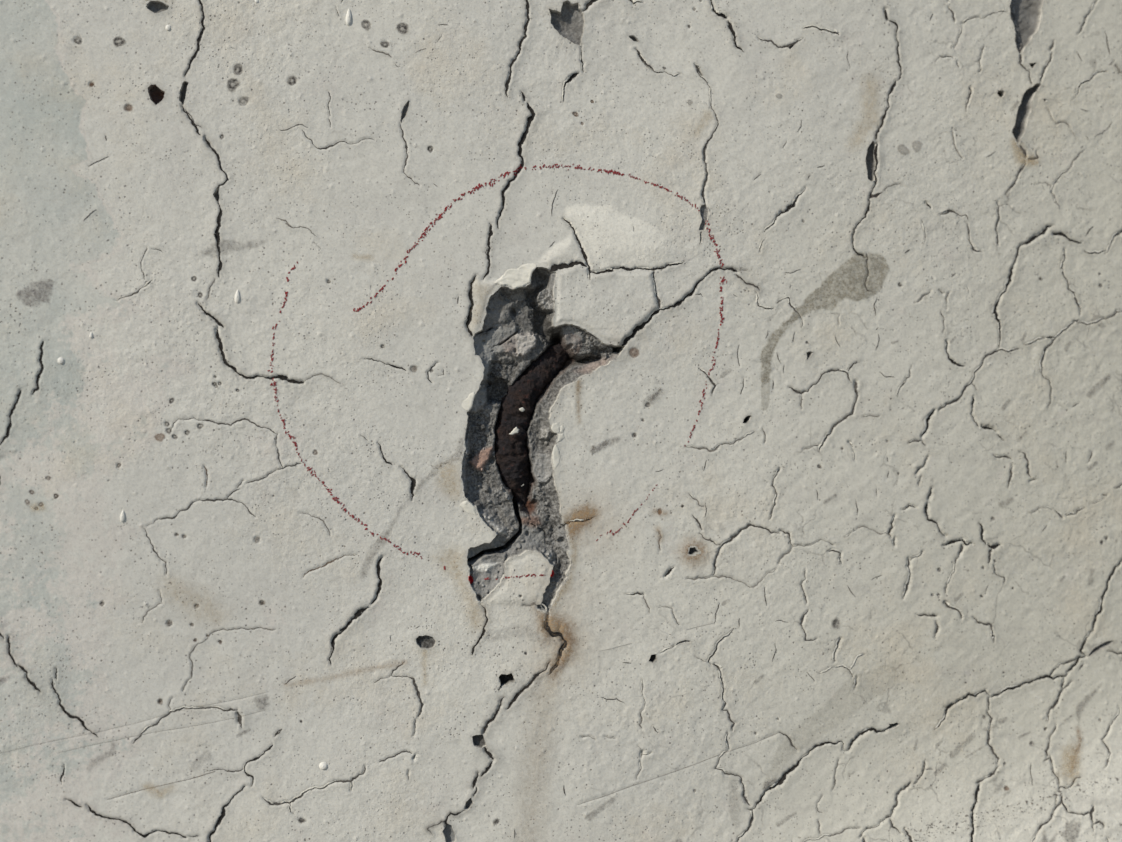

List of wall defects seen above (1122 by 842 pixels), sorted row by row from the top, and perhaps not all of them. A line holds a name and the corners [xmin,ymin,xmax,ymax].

crack [182,106,341,384]
crack [466,0,535,336]
spalling [549,1,585,46]
crack [550,190,804,346]
spalling [866,141,882,199]
spalling [1010,0,1044,69]
spalling [1012,83,1047,145]
spalling [460,263,639,611]
crack [658,66,1122,688]
crack [60,662,423,842]
rust [541,615,573,665]
crack [935,560,1122,842]